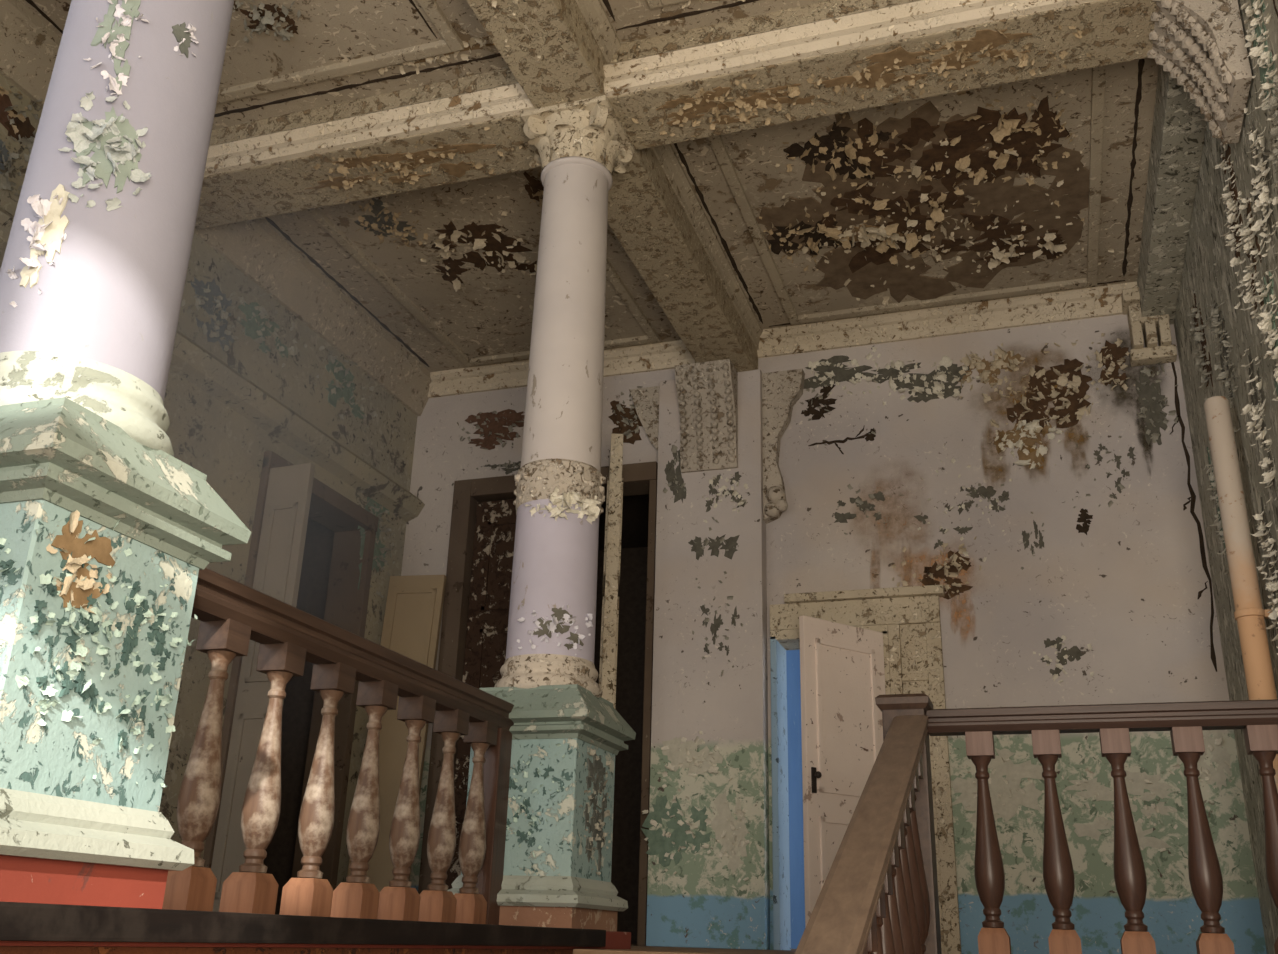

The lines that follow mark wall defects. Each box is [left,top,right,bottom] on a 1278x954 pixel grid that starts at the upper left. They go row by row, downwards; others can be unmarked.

peeling [0,0,152,294]
peeling [15,510,194,754]
peeling [304,127,537,322]
peeling [457,409,525,475]
crack [808,427,874,454]
peeling [632,28,1113,312]
peeling [892,457,1012,600]
peeling [800,333,1179,535]
crack [1097,58,1145,285]
crack [1170,362,1217,672]
peeling [1186,0,1278,655]
peeling [506,740,611,875]